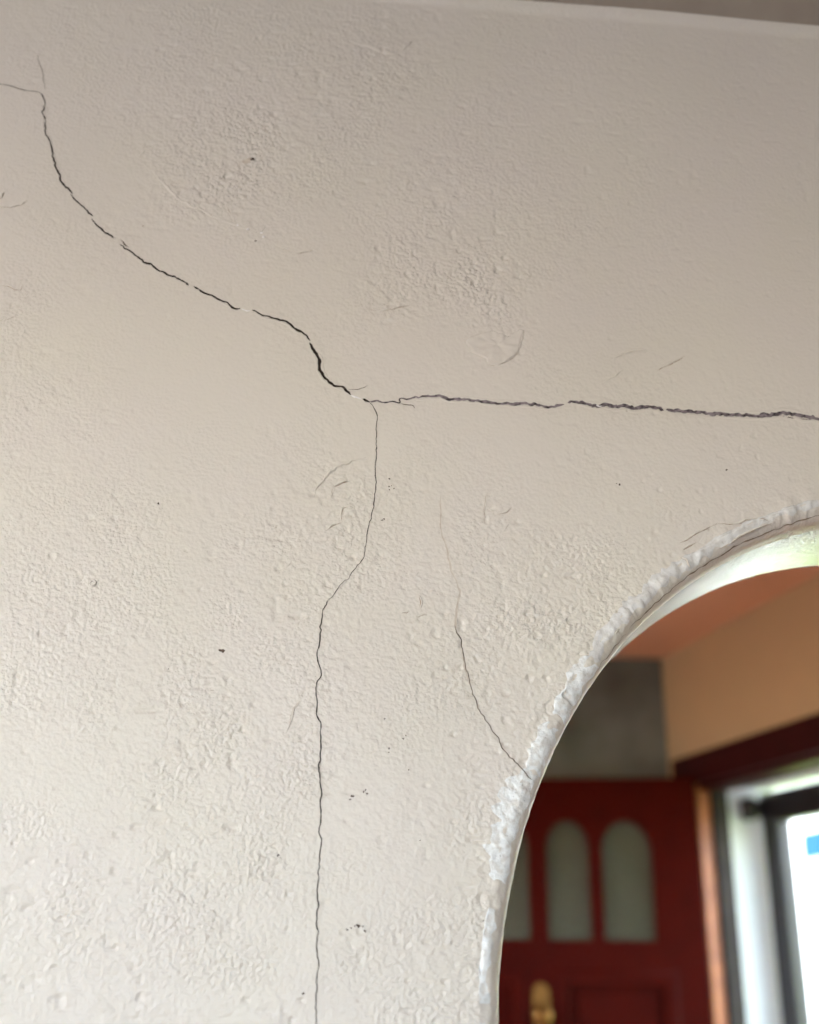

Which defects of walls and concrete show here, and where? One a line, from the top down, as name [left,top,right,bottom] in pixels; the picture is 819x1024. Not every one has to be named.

crack [1,84,819,598]
crack [315,602,327,1023]
crack [440,497,532,780]
peeling [479,908,497,1004]
peeling [482,500,819,884]
crack [597,515,819,671]